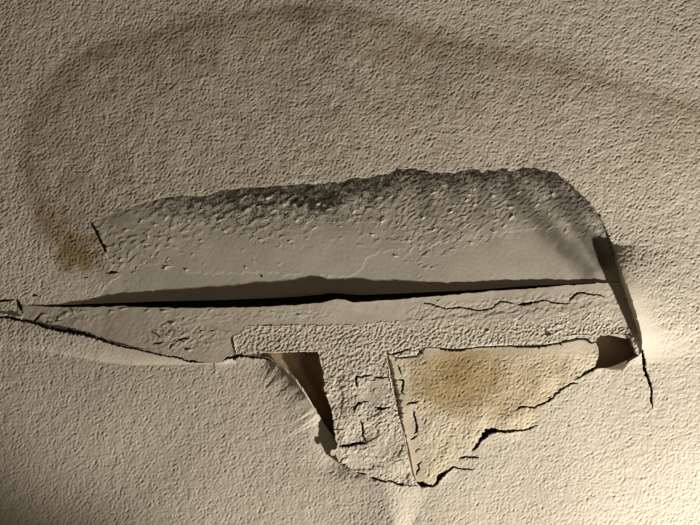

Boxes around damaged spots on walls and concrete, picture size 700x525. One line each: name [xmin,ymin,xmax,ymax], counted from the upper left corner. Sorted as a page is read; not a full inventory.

crack [91,222,107,252]
crack [0,281,618,363]
peeling [18,166,640,486]
crack [339,349,537,487]
crack [515,367,598,411]
crack [642,350,652,404]